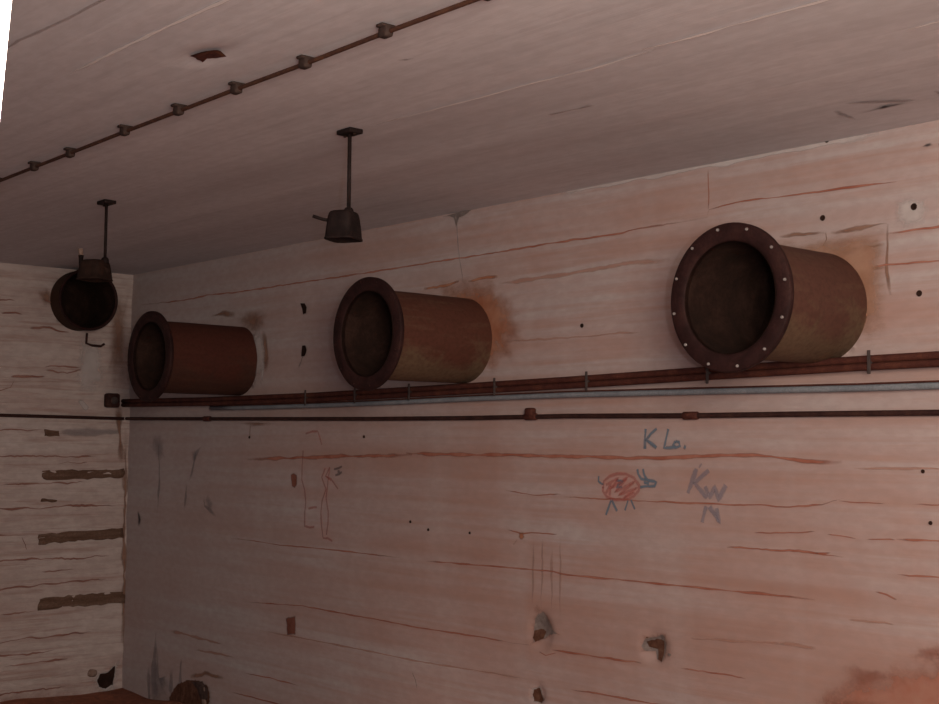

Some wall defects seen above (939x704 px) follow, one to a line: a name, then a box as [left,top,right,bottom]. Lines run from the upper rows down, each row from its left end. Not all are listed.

corrosion [787,224,889,317]
corrosion [426,276,513,357]
spalling [533,612,557,642]
spalling [642,635,671,662]
spalling [87,665,116,690]